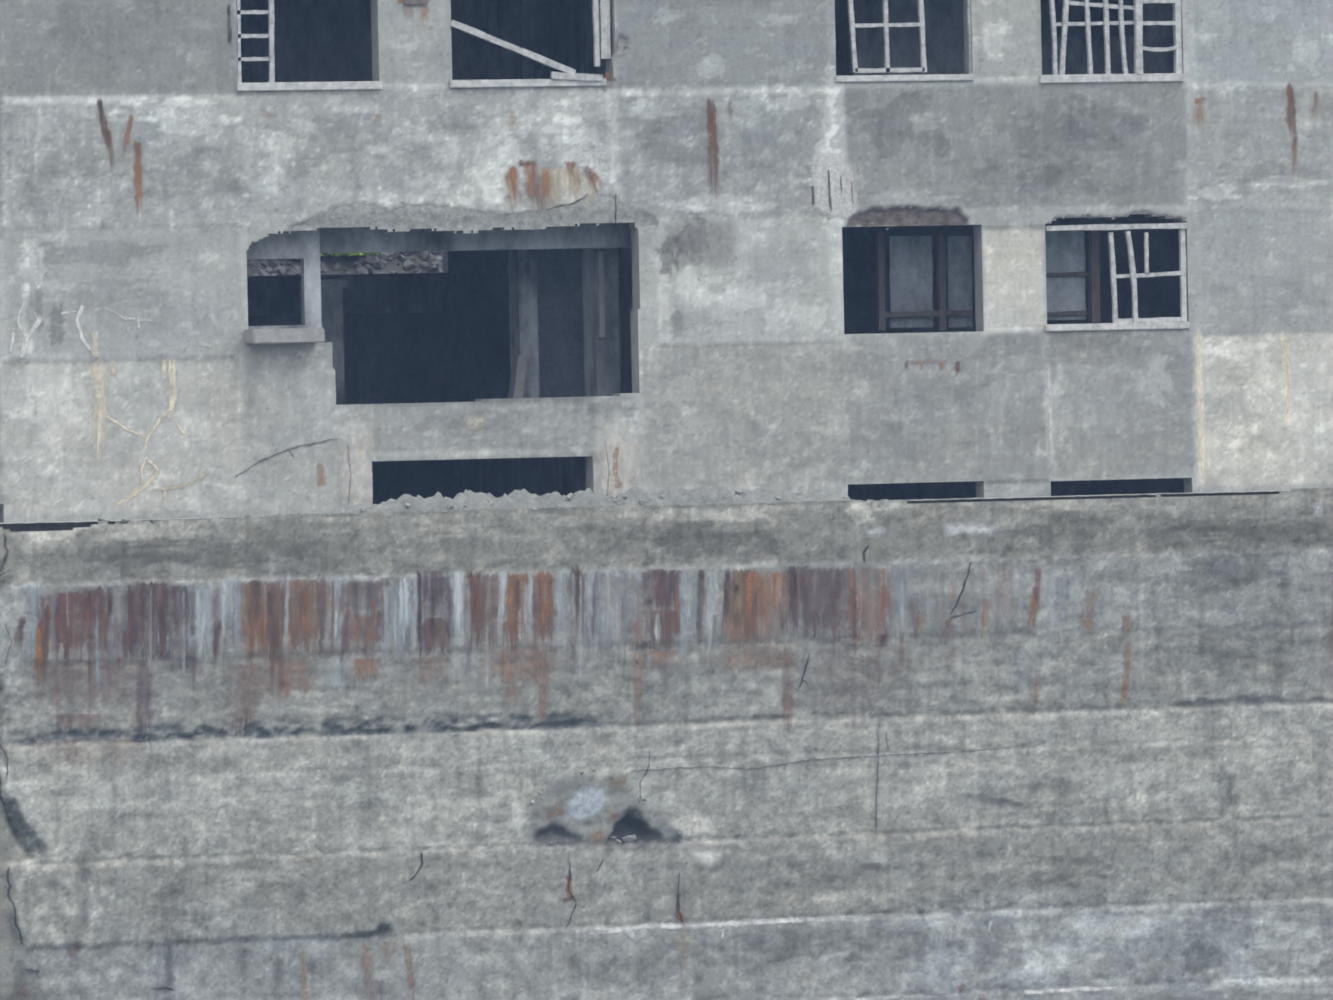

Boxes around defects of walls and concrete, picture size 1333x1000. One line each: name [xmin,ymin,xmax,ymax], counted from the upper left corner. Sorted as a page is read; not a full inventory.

corrosion [97,100,142,205]
spalling [289,191,661,239]
corrosion [507,160,598,202]
corrosion [707,99,718,179]
peeling [804,153,970,230]
crack [0,535,9,576]
corrosion [400,571,554,707]
corrosion [649,567,851,658]
crack [0,745,8,807]
spalling [535,769,682,846]
peeling [695,851,722,864]
crack [7,868,39,972]